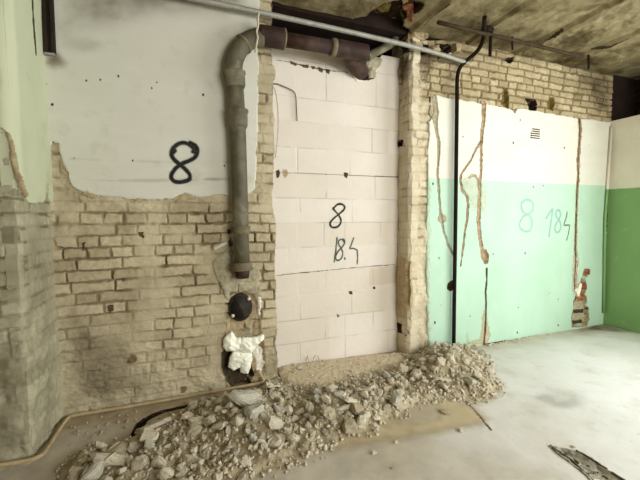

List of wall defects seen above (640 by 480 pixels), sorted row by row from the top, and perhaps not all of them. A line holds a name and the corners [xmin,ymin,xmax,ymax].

flaking render [259,0,272,26]
peeling [464,179,486,209]
flaking render [0,47,288,471]
spalling [571,257,590,328]